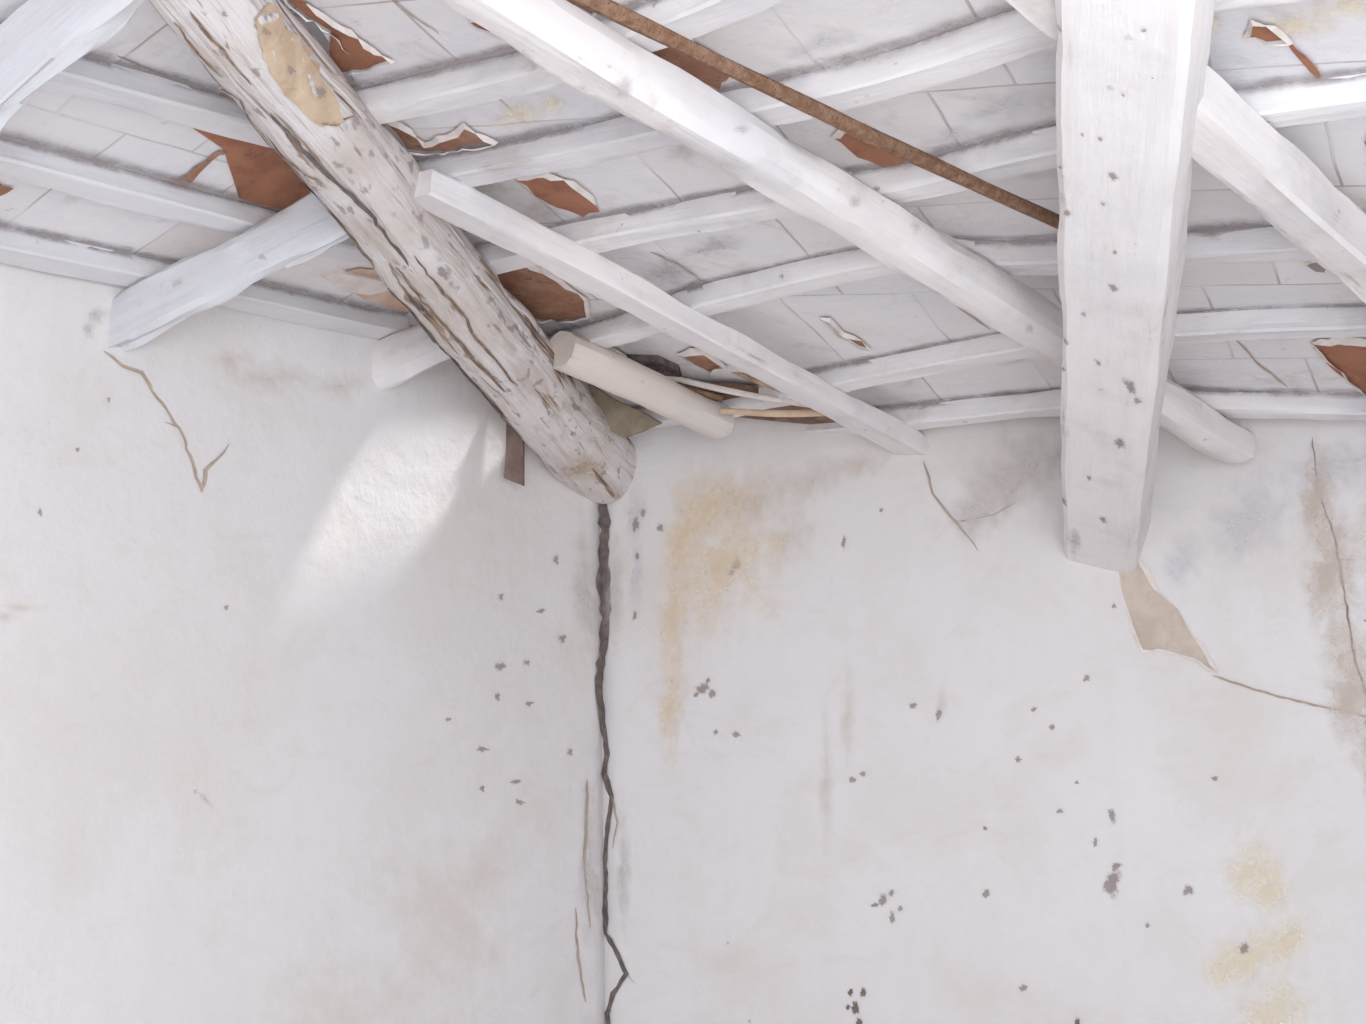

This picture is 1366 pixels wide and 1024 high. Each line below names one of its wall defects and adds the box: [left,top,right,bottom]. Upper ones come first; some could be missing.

peeling [284,0,395,76]
peeling [651,39,729,90]
peeling [166,128,311,212]
peeling [515,173,599,217]
peeling [831,129,905,168]
peeling [497,266,590,326]
peeling [1311,338,1366,395]
crack [104,351,229,492]
crack [1213,437,1366,718]
peeling [1119,559,1218,675]
leakage [694,678,715,698]
crack [575,504,632,1024]